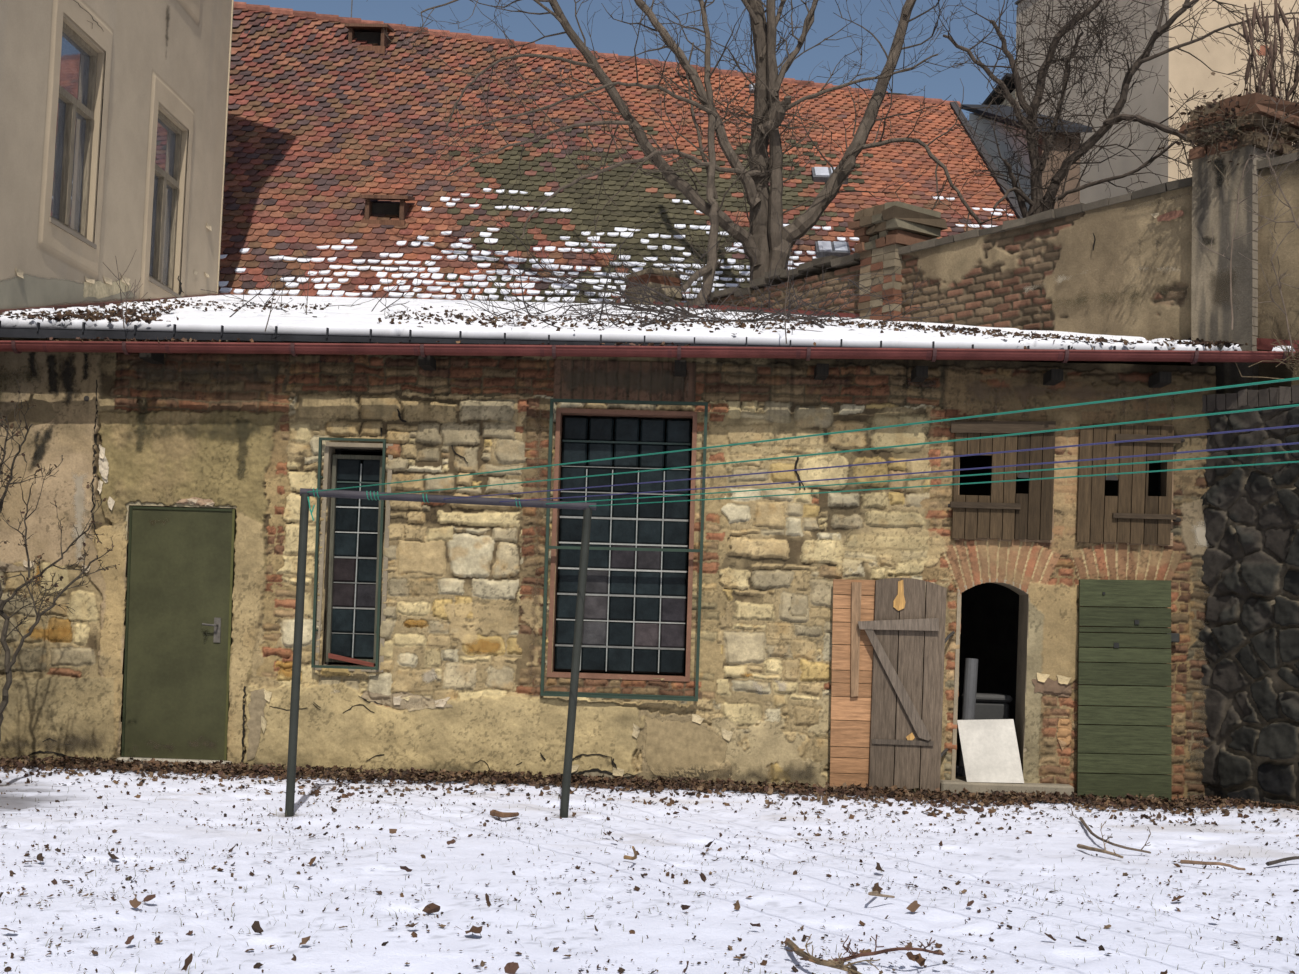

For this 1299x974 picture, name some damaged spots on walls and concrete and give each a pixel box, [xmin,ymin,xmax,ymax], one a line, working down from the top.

peeling [83,276,131,299]
peeling [97,444,115,510]
water stain [137,400,147,451]
water stain [237,420,249,478]